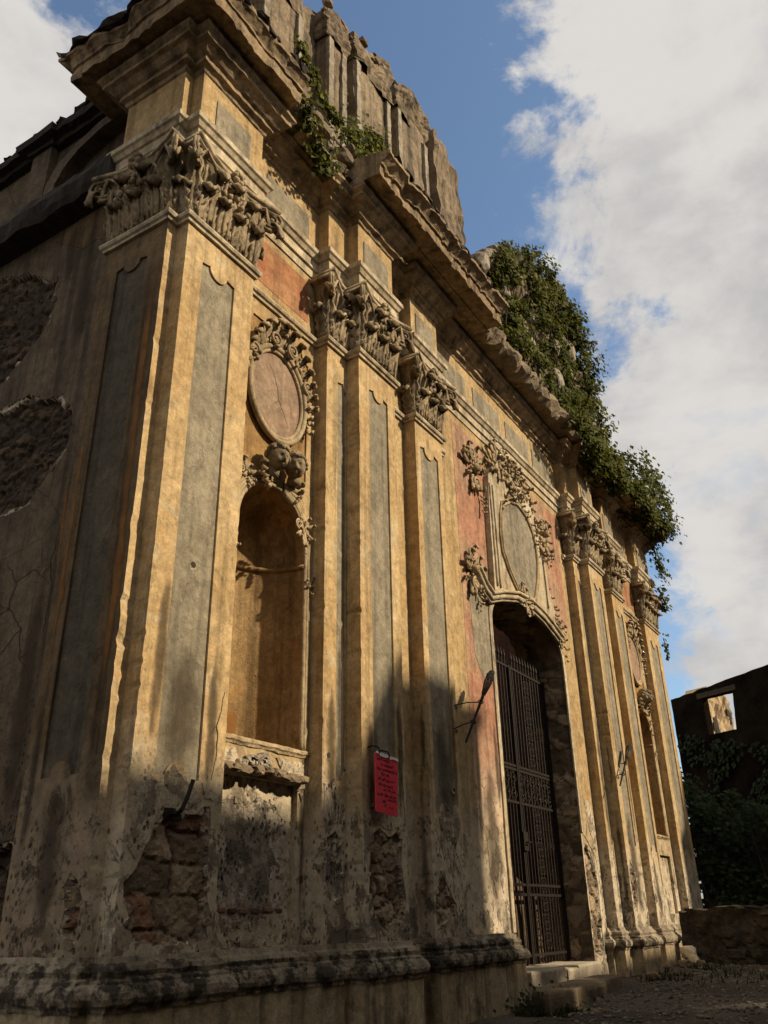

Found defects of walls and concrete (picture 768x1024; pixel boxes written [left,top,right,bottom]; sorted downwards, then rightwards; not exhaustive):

flaking render [0,272,59,384]
flaking render [0,394,72,517]
crack [0,524,60,665]
flaking render [123,764,282,949]
flaking render [368,828,407,941]